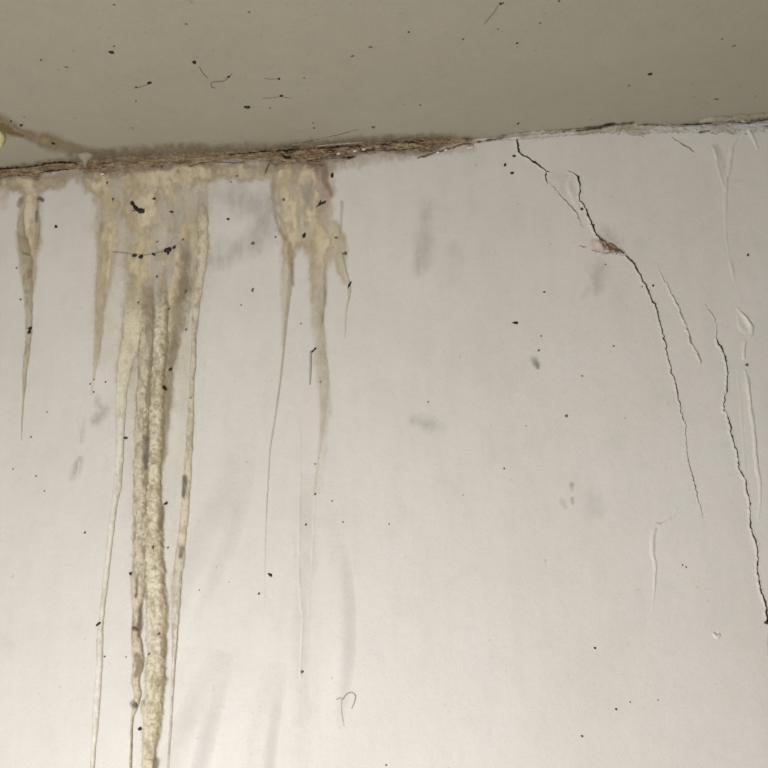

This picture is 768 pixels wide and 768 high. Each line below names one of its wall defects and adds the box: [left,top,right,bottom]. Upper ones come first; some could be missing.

damp [1,176,64,428]
damp [83,163,351,768]
crack [502,113,768,637]